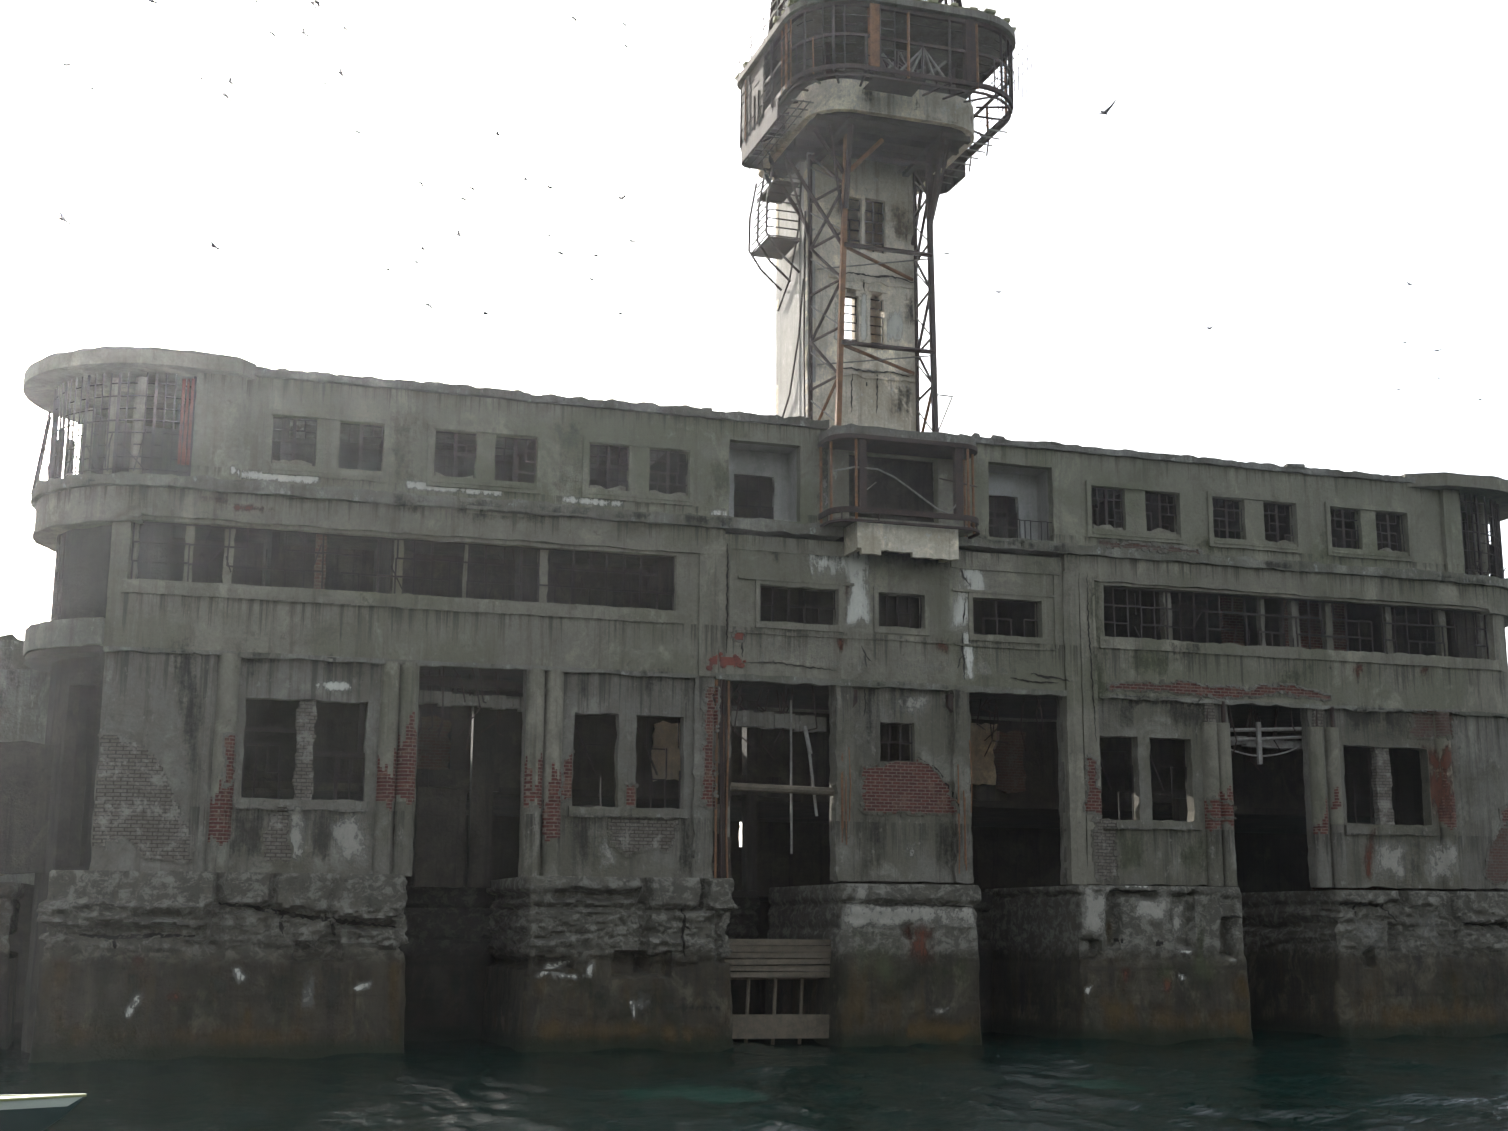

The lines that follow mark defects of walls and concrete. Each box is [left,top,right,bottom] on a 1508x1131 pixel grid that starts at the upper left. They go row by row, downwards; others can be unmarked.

water stain [809,552,894,624]
water stain [897,559,991,722]
spalling [1107,679,1332,773]
spalling [92,732,196,865]
flaking render [859,758,960,818]